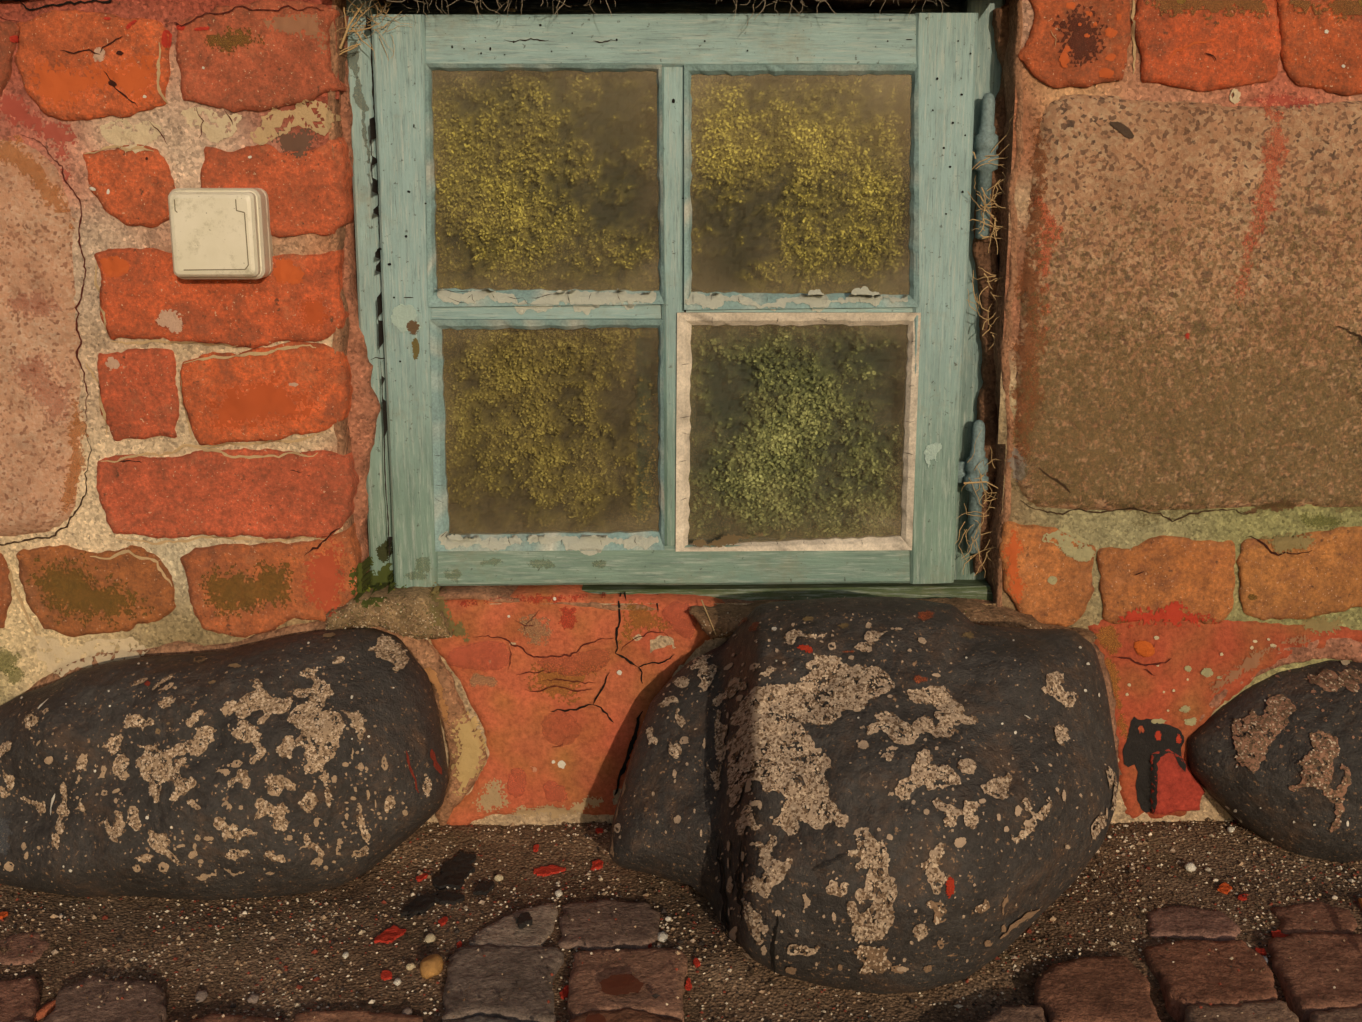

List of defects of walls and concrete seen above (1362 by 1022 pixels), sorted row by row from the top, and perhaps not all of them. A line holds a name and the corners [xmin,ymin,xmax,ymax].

peeling [437,288,656,315]
peeling [685,286,909,313]
crack [1335,326,1362,342]
peeling [438,531,659,556]
crack [479,592,672,795]